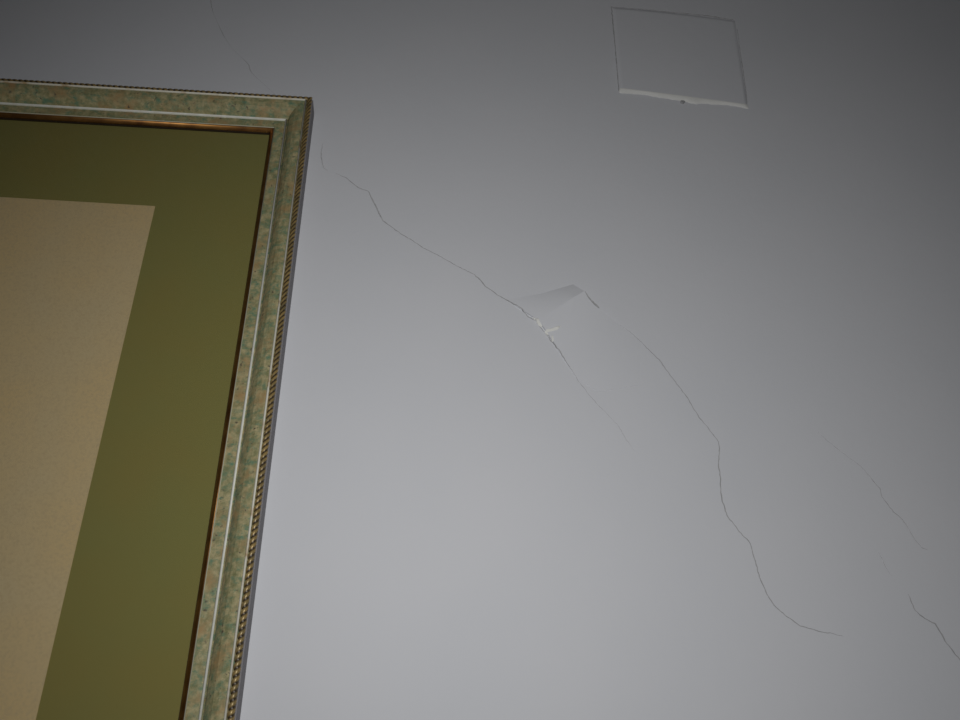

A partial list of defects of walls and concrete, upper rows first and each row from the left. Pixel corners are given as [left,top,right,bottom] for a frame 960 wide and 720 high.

crack [321,144,634,450]
crack [620,325,842,636]
crack [909,596,960,660]